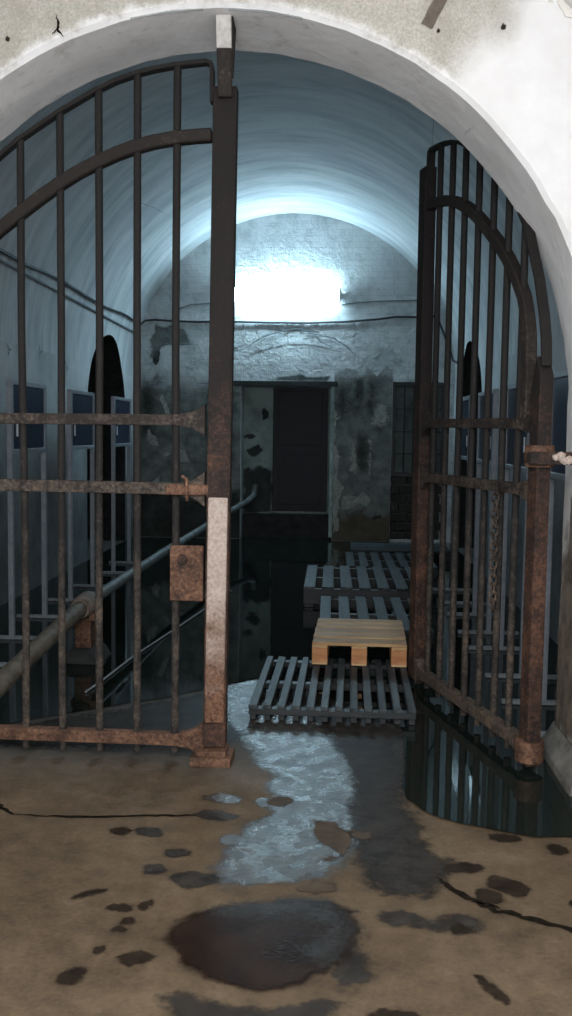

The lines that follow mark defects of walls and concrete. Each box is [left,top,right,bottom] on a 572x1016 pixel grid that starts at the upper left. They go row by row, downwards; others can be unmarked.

crack [52,16,64,37]
spalling [148,325,189,365]
leakage [332,372,393,541]
crack [0,804,199,818]
leakage [378,910,485,934]
crack [435,877,572,933]
leakage [332,938,373,986]